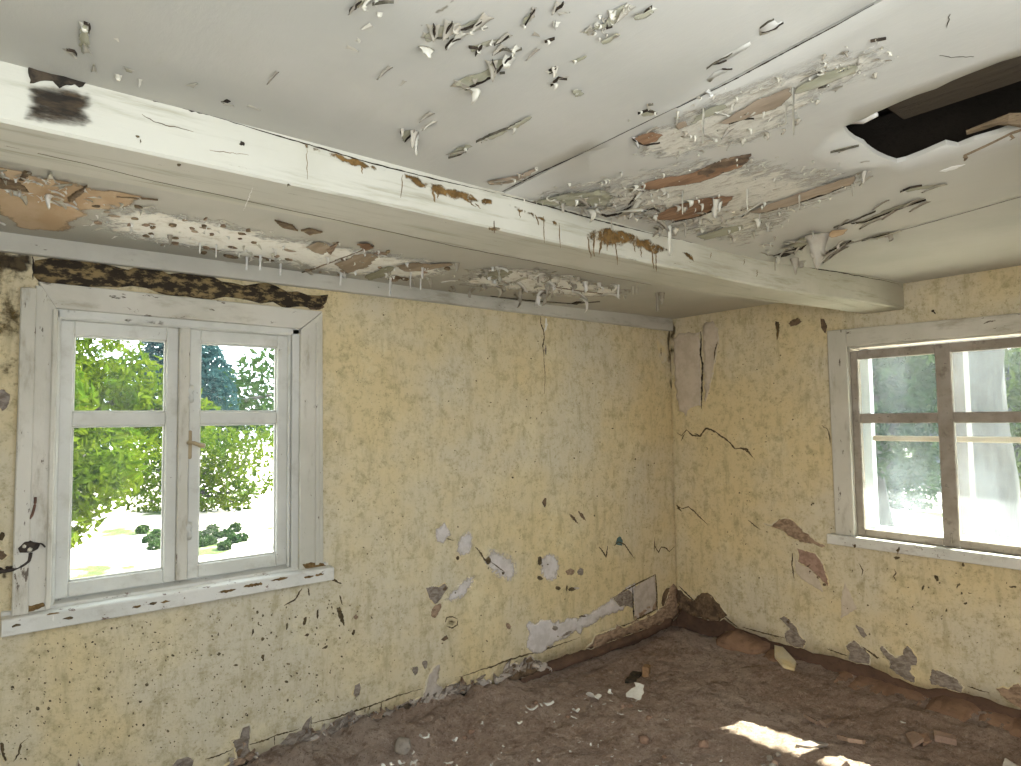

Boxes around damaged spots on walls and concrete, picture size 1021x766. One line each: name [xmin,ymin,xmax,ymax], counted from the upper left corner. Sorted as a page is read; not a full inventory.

peeling [346,0,394,52]
peeling [418,1,570,105]
peeling [523,37,965,275]
leakage [0,252,30,278]
peeling [0,167,638,312]
leakage [0,298,20,334]
peeling [656,321,719,416]
crack [679,428,753,458]
peeling [764,517,829,592]
spalling [284,562,358,635]
peeling [281,574,728,745]
spalling [845,625,918,684]